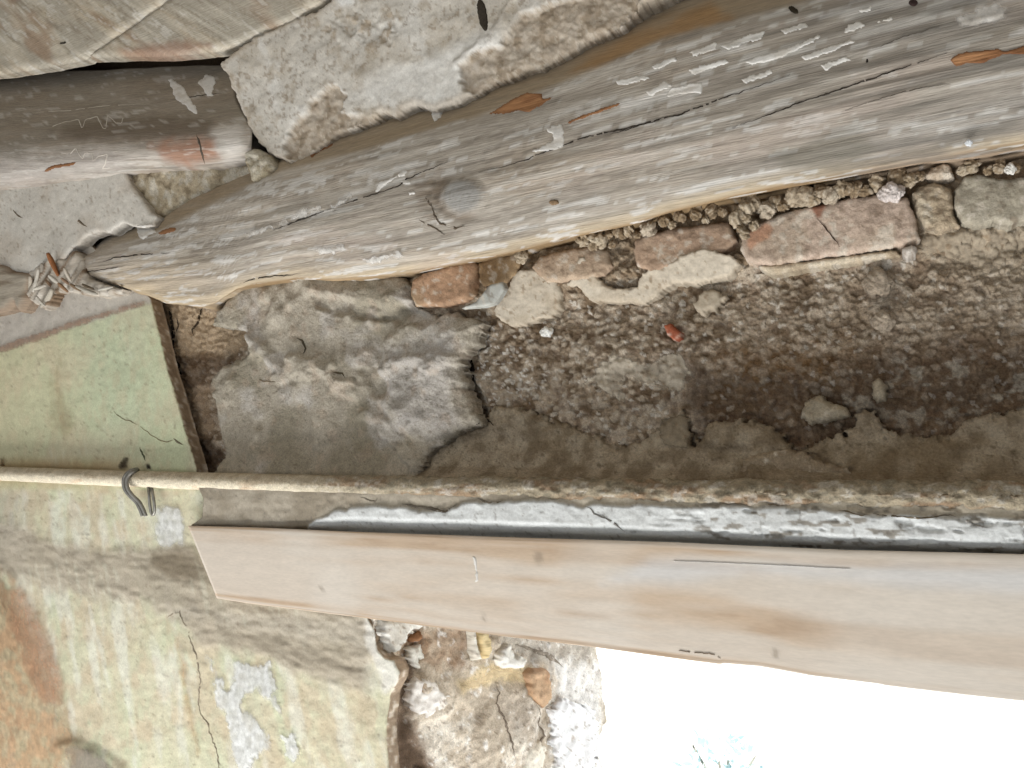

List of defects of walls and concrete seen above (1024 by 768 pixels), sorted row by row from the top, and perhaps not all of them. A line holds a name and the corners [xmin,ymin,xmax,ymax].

flaking render [1004,162,1017,175]
crack [470,360,494,426]
crack [115,413,183,460]
crack [166,611,219,768]
peeling [211,661,299,768]